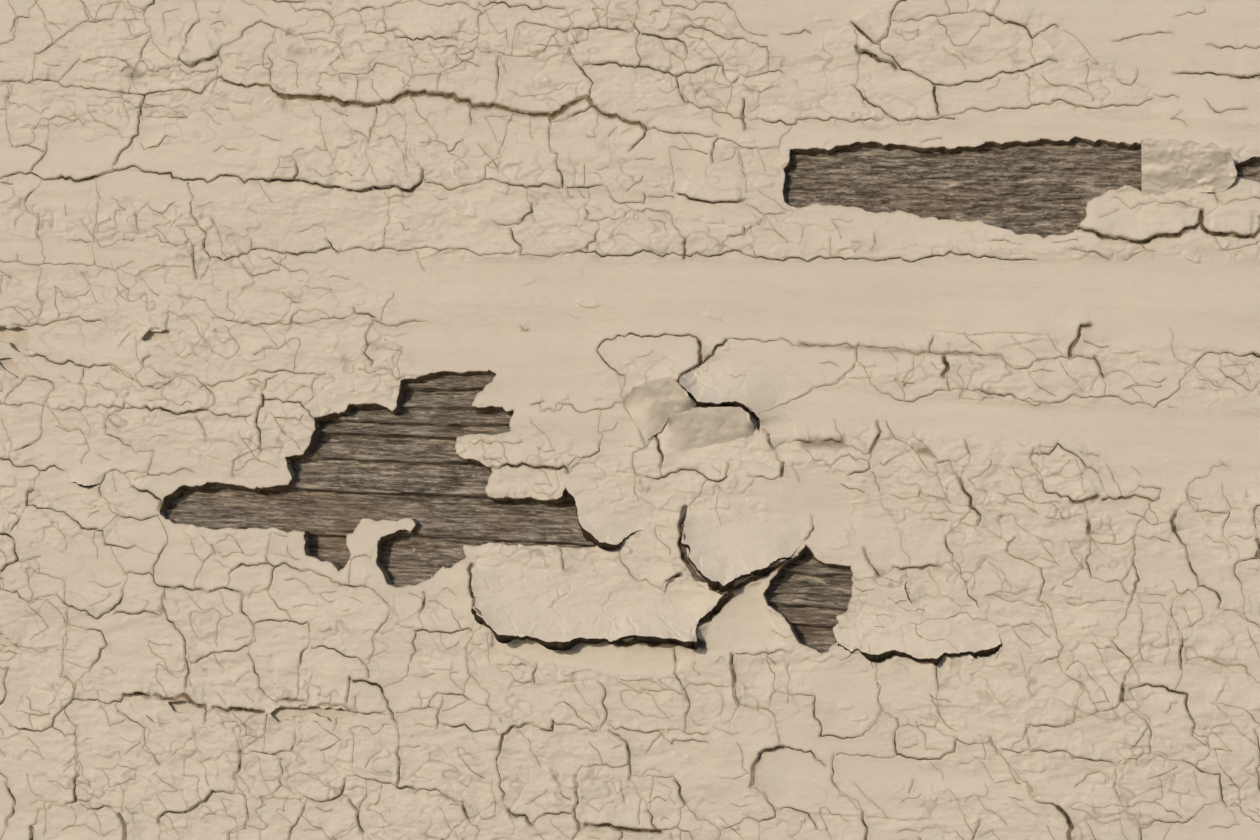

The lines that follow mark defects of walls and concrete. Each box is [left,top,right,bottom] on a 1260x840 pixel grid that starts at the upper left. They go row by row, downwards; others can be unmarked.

crack [0,0,1152,278]
peeling [783,137,1260,238]
crack [1074,201,1260,261]
crack [1176,45,1260,113]
peeling [0,326,29,378]
crack [0,316,326,473]
crack [212,308,421,366]
crack [558,325,1260,499]
peeling [159,356,1002,666]
crack [0,444,814,840]
crack [748,443,1260,830]
crack [1036,801,1074,840]